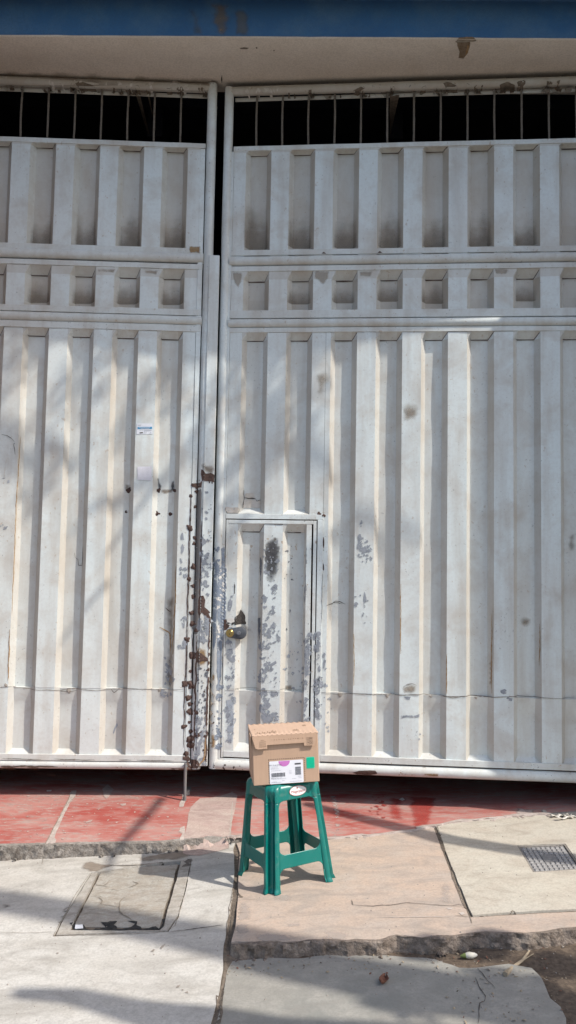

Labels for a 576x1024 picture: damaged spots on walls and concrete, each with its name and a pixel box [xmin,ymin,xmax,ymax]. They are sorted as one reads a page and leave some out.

corrosion [159,466,243,770]
peeling [177,489,236,766]
peeling [257,535,331,732]
peeling [357,520,372,563]